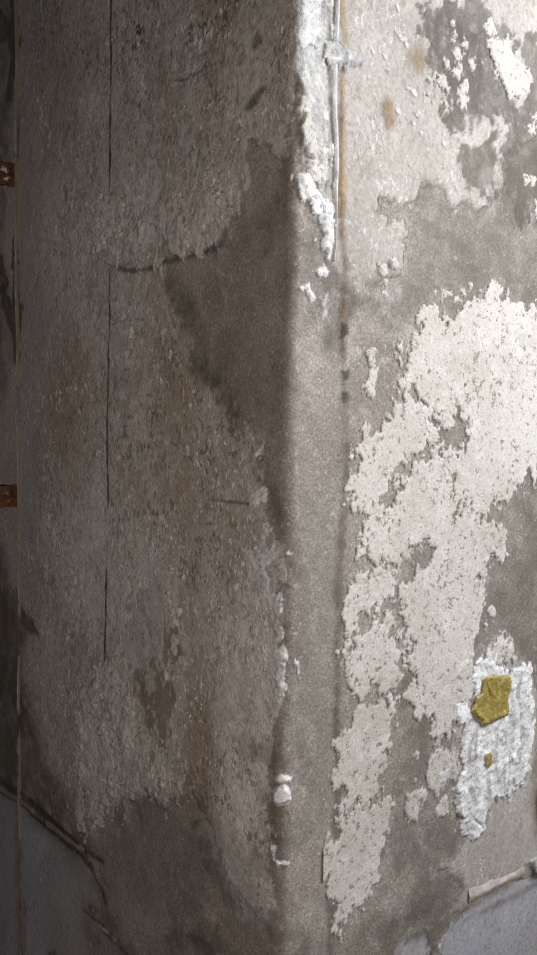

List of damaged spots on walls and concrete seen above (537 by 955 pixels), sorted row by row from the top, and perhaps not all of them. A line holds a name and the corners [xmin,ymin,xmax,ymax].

crack [106,0,114,188]
water stain [417,0,537,229]
peeling [487,33,533,100]
crack [106,255,177,500]
crack [101,571,109,661]
water stain [249,486,268,509]
water stain [246,523,300,699]
spalling [79,84,537,955]
efflorescence [439,645,536,841]
efflorescence [261,821,290,868]